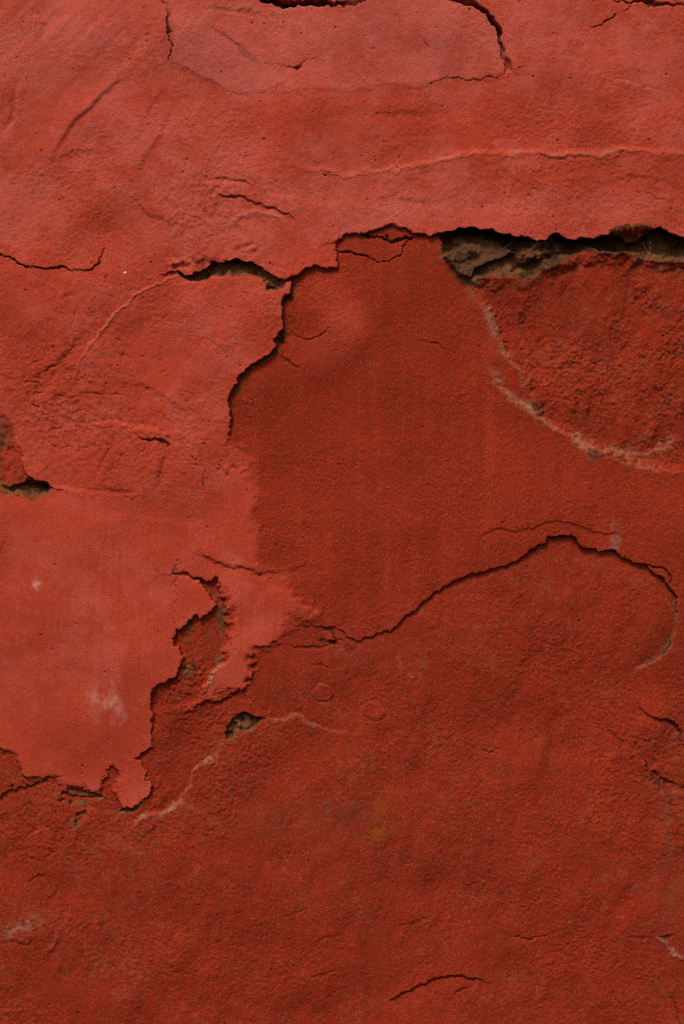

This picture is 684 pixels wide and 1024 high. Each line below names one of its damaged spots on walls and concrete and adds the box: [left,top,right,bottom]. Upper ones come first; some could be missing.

crack [259,0,366,9]
crack [419,0,514,89]
crack [0,245,111,286]
crack [271,519,678,672]
peeling [0,222,684,1024]
crack [634,698,684,747]
crack [385,973,496,1005]